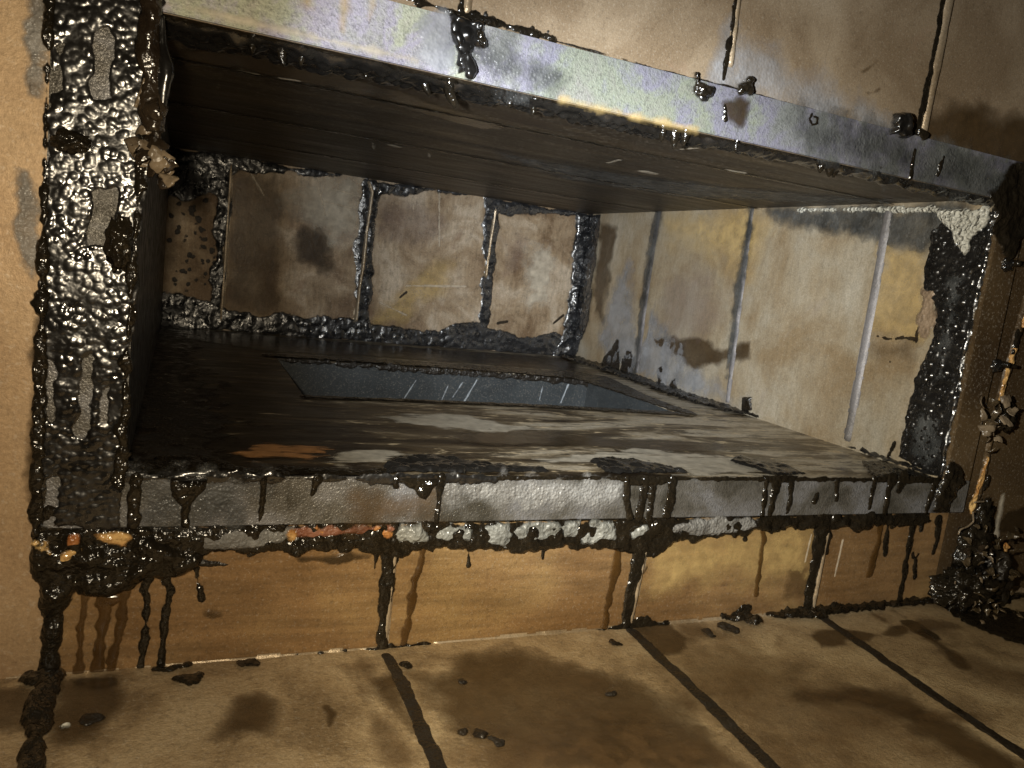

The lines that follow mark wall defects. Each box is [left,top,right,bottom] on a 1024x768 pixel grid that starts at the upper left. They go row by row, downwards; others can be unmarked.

peeling [124,98,179,190]
water stain [601,211,707,392]
rust [287,525,394,541]
water stain [72,577,176,674]
water stain [194,566,206,602]